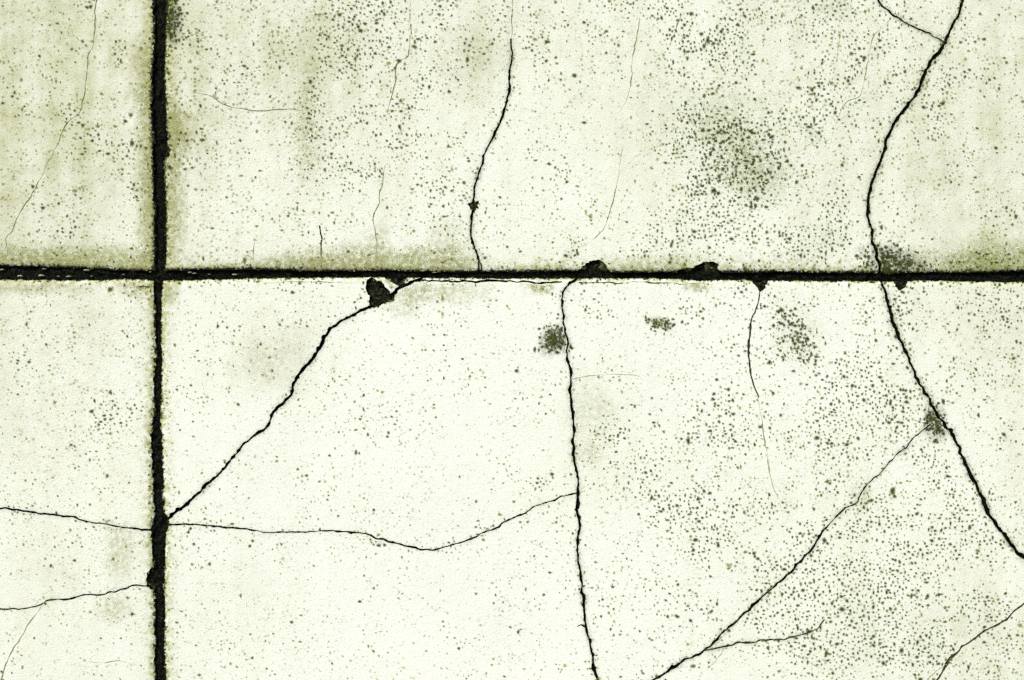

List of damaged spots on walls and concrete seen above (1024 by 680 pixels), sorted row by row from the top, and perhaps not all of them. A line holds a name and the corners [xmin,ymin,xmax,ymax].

water stain [1,280,104,413]
water stain [83,594,333,680]
crack [0,0,696,680]
water stain [262,295,521,574]
water stain [388,511,505,611]
crack [652,0,1024,680]